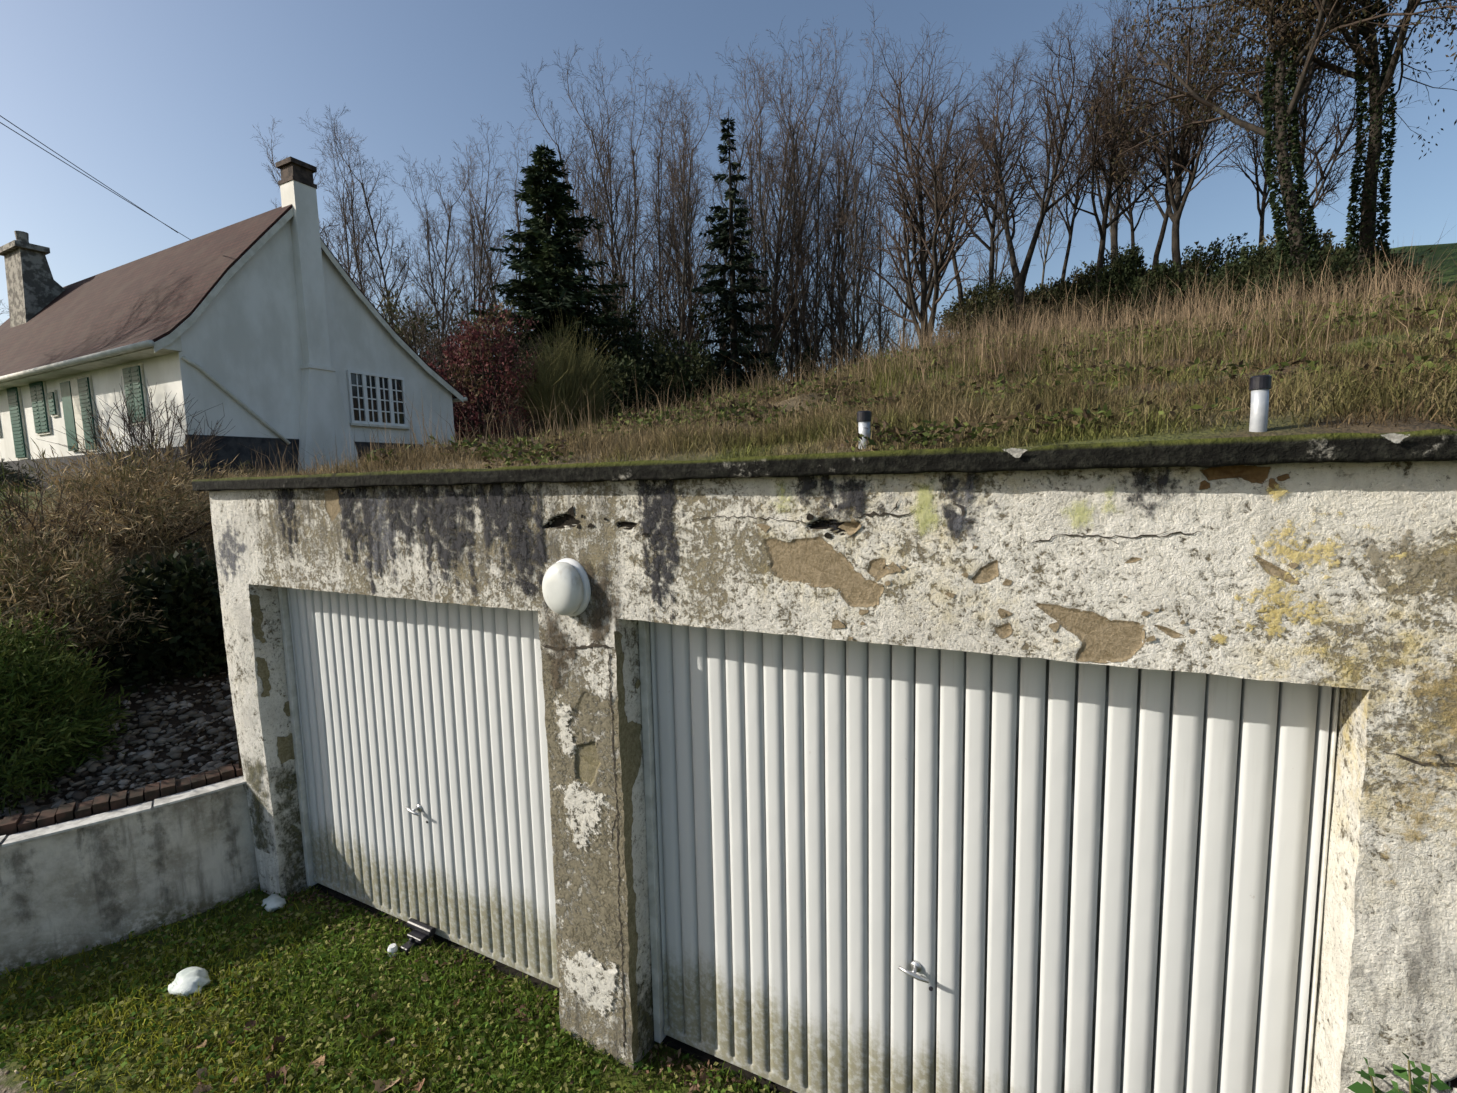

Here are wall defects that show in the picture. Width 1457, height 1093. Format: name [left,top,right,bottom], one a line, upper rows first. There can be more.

water stain [338,482,619,689]
water stain [637,480,684,621]
peeling [757,505,907,640]
peeling [961,560,1012,586]
peeling [994,608,1013,639]
peeling [1036,603,1196,664]
crack [1385,747,1457,767]
water stain [243,757,307,896]
water stain [633,978,656,1061]